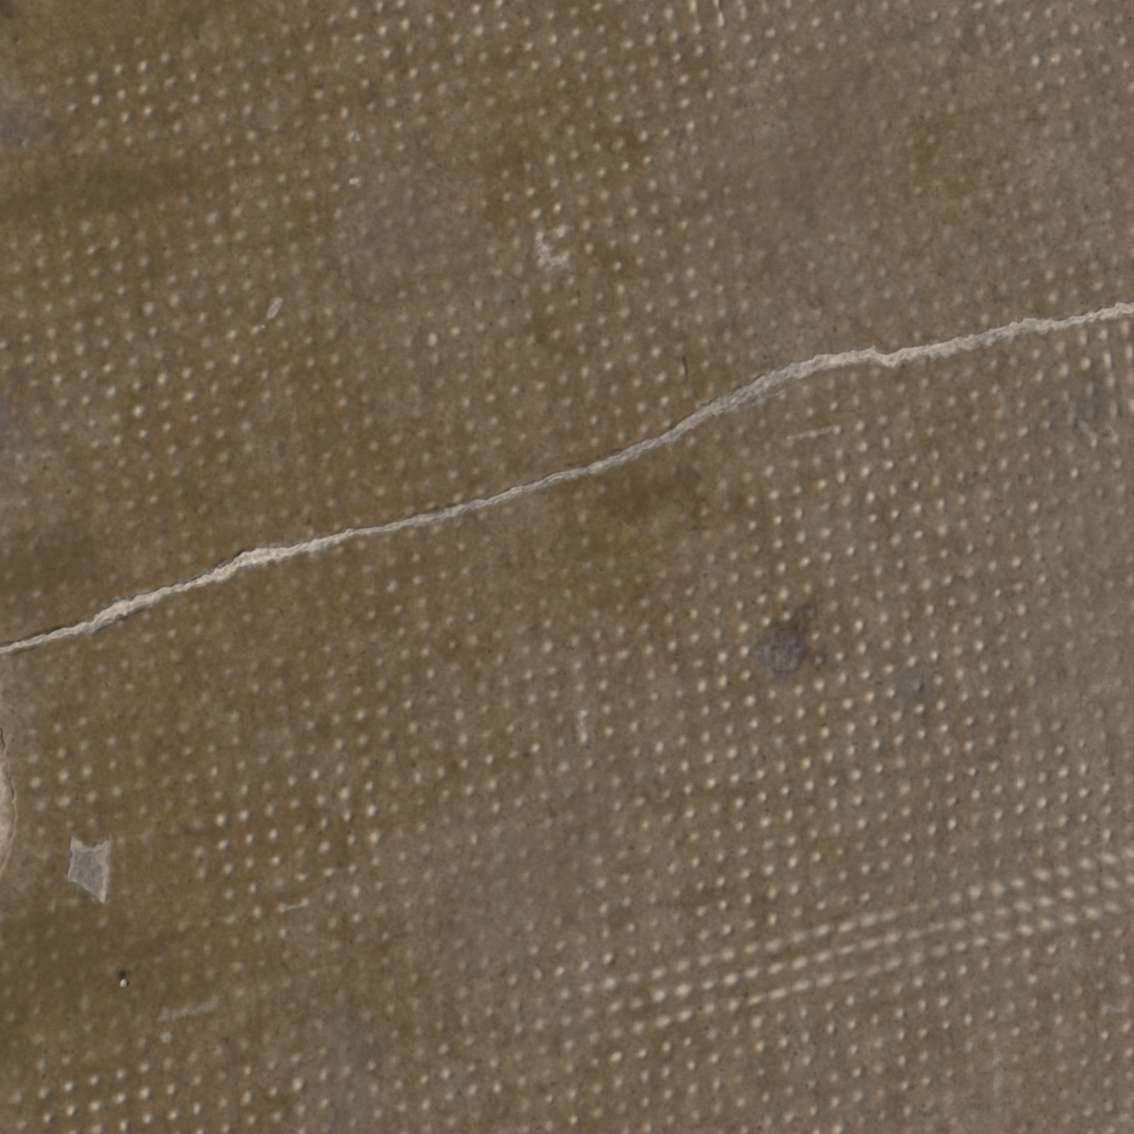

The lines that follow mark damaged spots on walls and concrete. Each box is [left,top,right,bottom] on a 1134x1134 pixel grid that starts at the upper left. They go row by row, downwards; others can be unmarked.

crack [0,300,1134,654]
spalling [0,729,15,869]